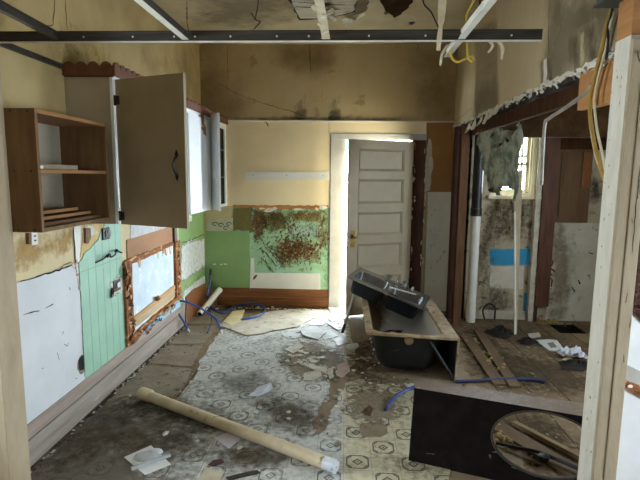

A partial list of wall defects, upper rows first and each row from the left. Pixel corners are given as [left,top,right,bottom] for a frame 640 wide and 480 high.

flaking render [380,0,413,19]
flaking render [453,48,615,133]
leakage [17,230,72,260]
peeling [157,238,205,300]
leakage [485,199,531,245]
leakage [549,226,581,303]
peeling [110,260,175,344]